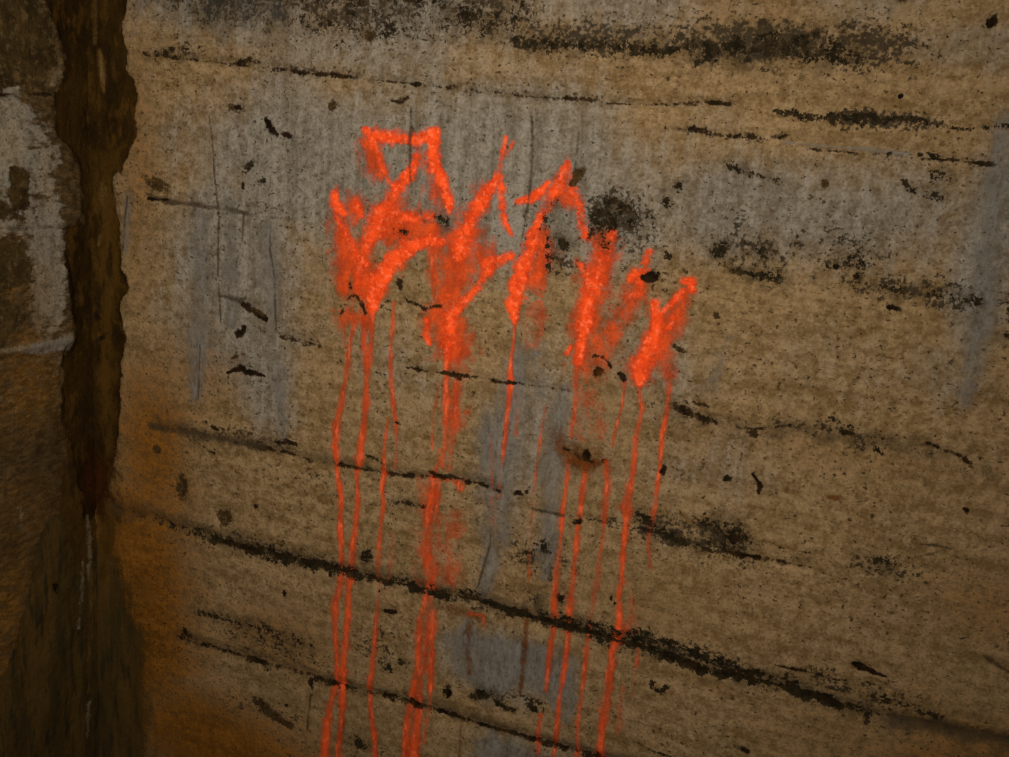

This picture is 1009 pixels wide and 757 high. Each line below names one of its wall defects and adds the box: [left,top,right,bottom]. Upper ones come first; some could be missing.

water stain [143,42,209,64]
water stain [169,0,287,35]
water stain [299,0,871,69]
water stain [360,547,374,563]
water stain [871,556,897,570]
water stain [0,507,151,757]
water stain [194,609,313,650]
water stain [447,619,576,723]